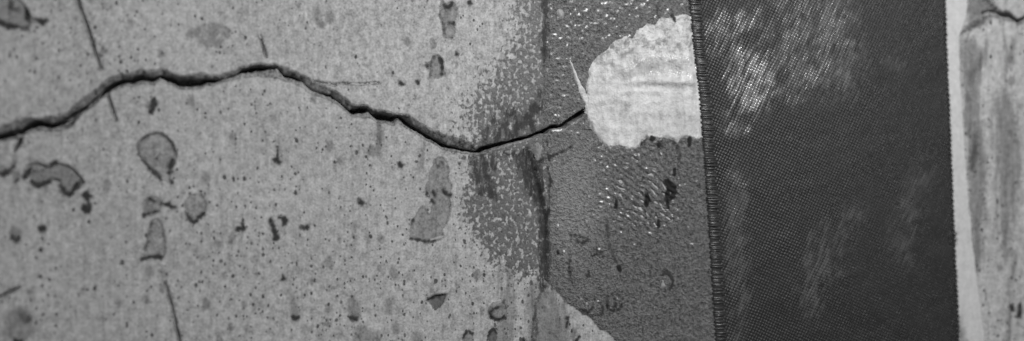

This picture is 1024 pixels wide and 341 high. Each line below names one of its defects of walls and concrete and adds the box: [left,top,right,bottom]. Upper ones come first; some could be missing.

crack [0,0,586,291]